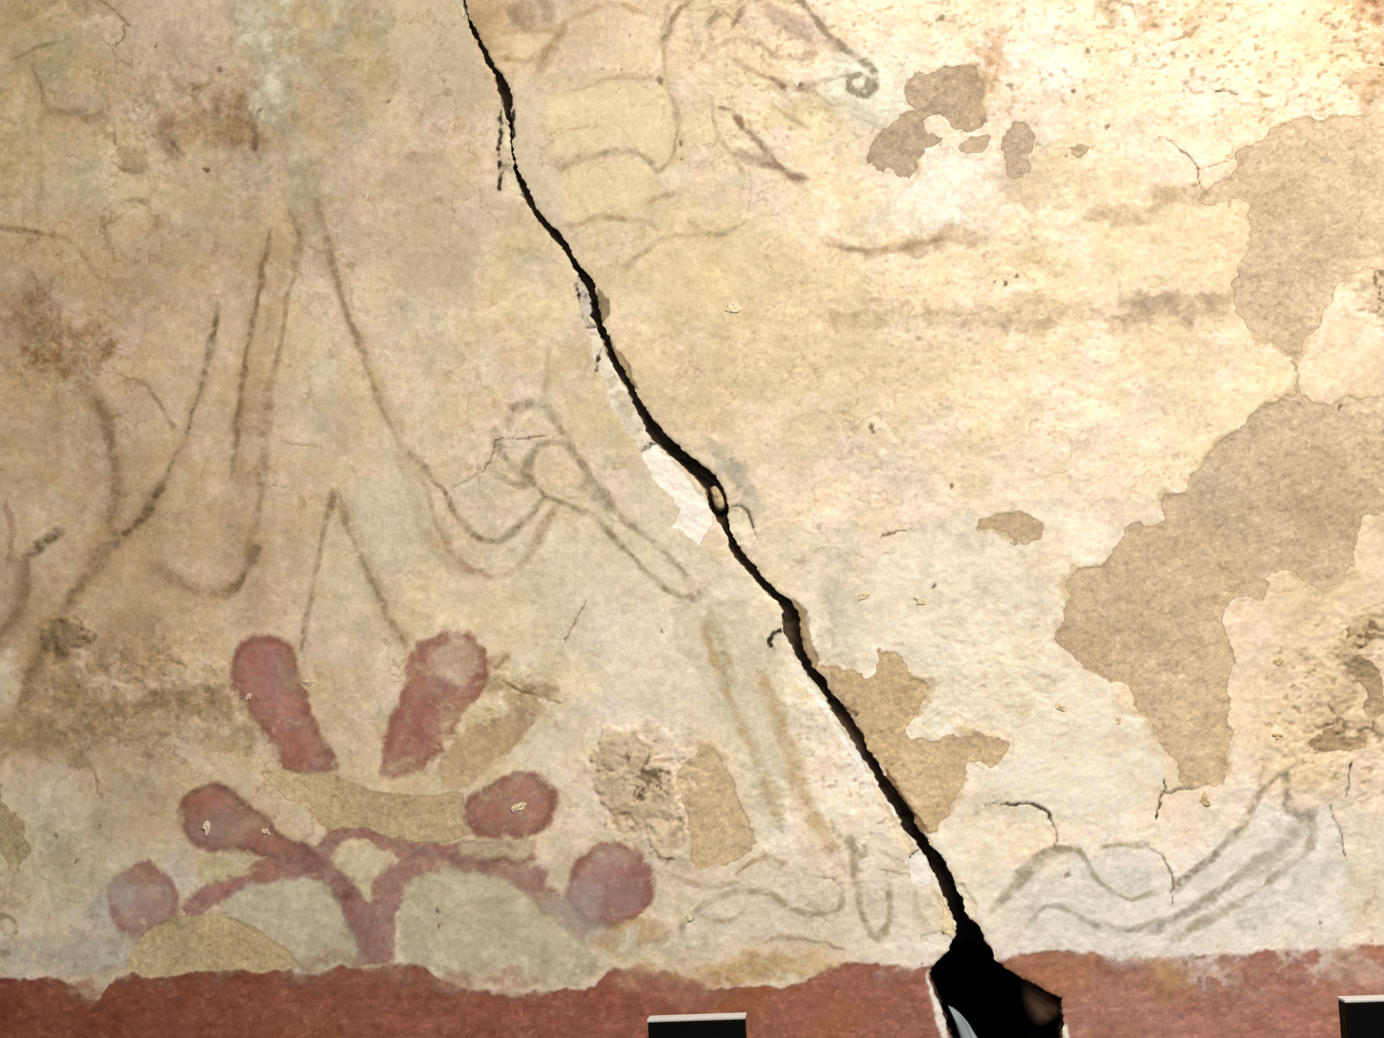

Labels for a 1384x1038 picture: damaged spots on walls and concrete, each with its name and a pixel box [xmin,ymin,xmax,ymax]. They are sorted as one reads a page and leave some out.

spalling [867,64,1035,178]
crack [455,0,986,943]
spalling [976,511,1043,545]
spalling [1055,109,1384,806]
spalling [598,728,756,870]
spalling [817,649,1009,833]
crack [992,802,1057,836]